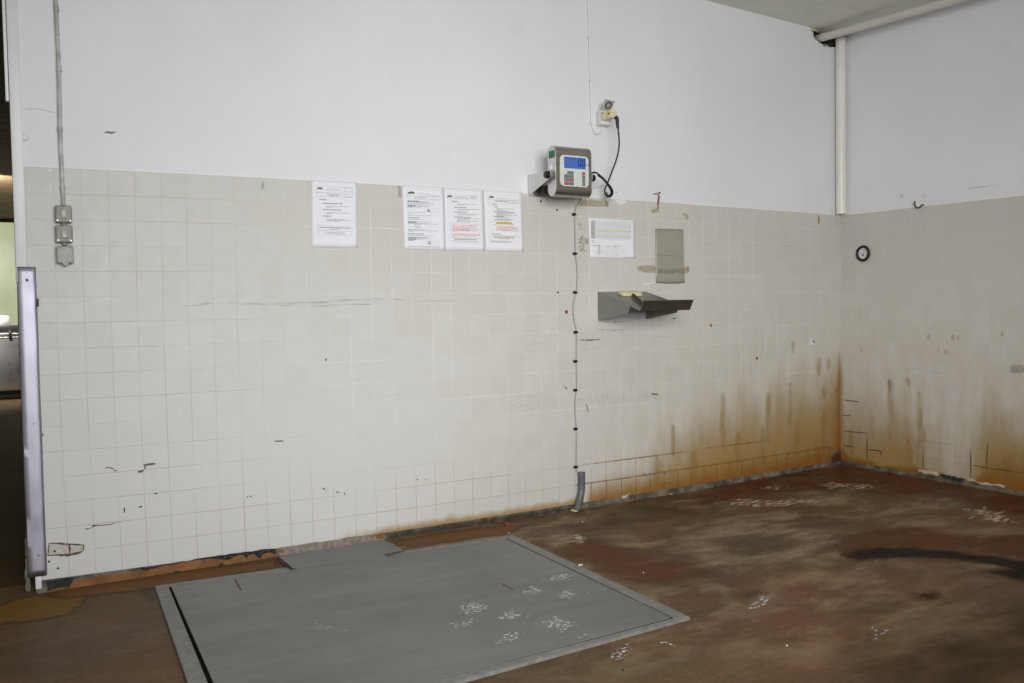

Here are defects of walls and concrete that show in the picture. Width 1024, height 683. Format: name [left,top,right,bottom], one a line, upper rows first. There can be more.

leakage [656,390,925,482]
leakage [973,431,1024,480]
peeling [47,548,285,599]